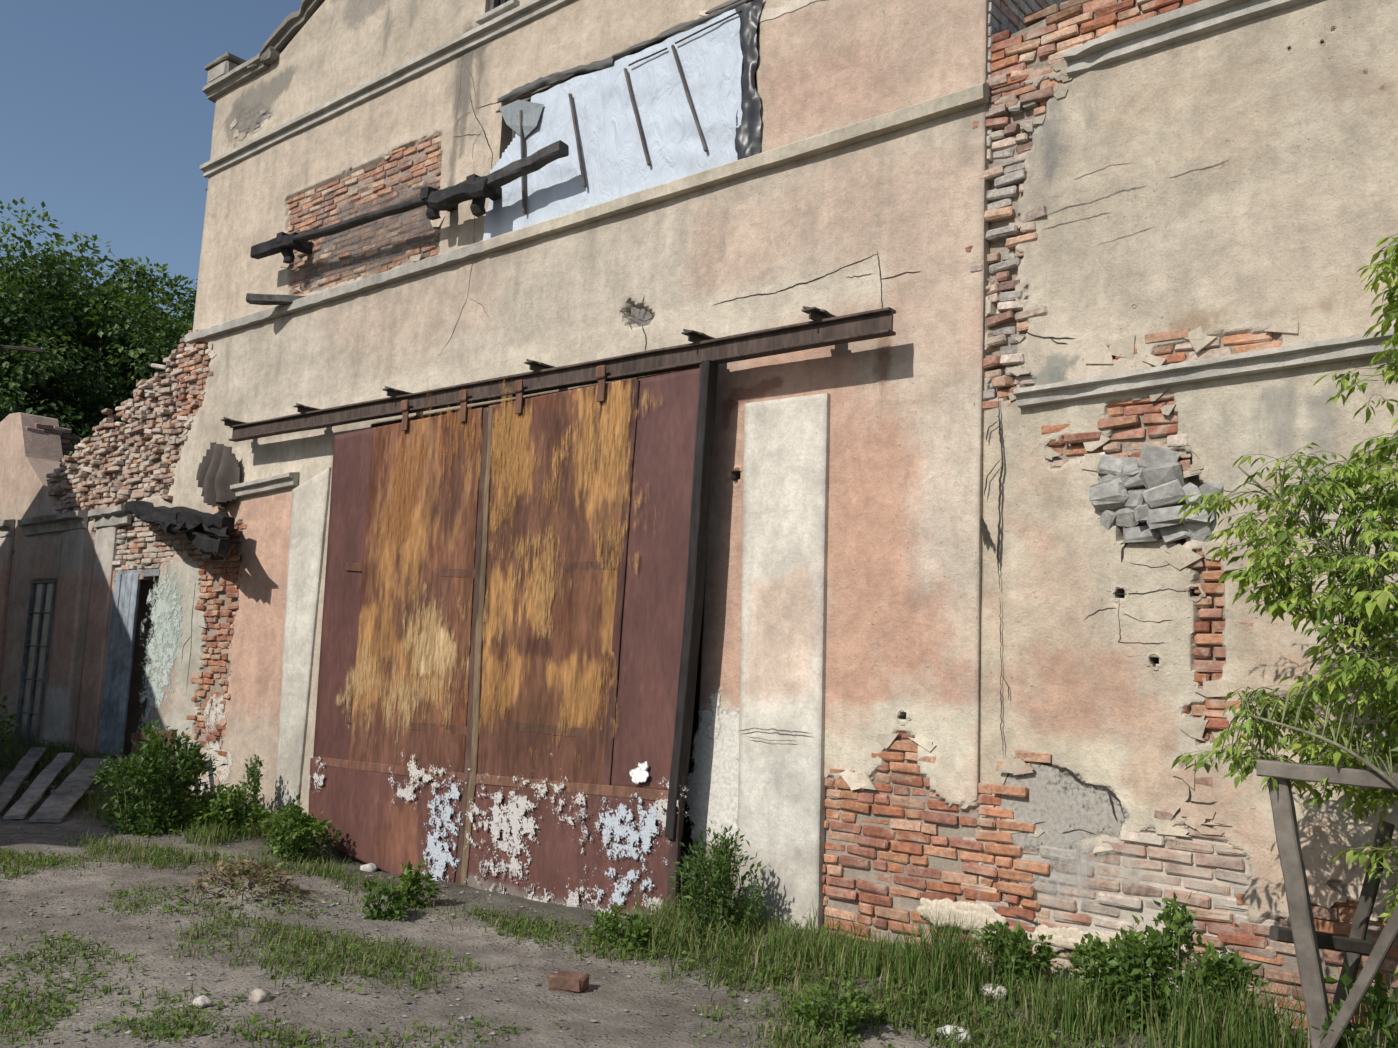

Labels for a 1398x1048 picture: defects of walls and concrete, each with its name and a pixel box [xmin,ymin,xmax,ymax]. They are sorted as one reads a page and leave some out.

crack [714,252,921,308]
flaking render [965,58,1073,411]
crack [1041,158,1231,246]
rust [478,385,536,546]
rust [544,390,647,503]
flaking render [46,330,247,796]
rust [337,602,468,728]
rust [499,534,554,635]
crack [980,395,1125,925]
crack [1084,537,1189,644]
peeling [388,753,687,917]
flaking render [822,721,1308,1032]